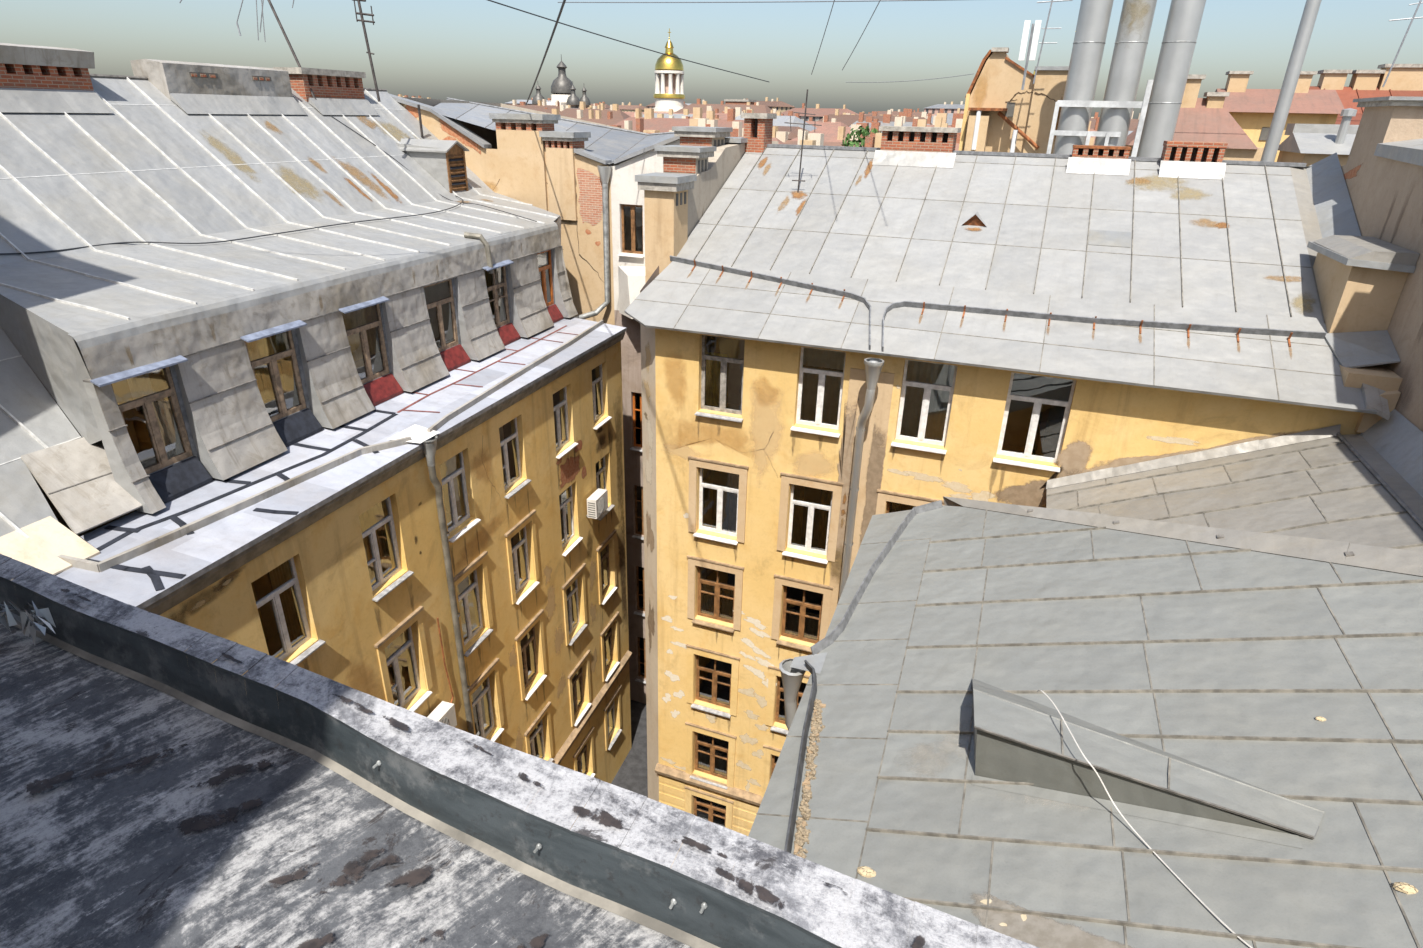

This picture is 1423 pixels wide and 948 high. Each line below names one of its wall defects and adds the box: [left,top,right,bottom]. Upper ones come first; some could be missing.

rust [356,115,407,141]
rust [210,137,253,172]
rust [283,170,343,206]
rust [341,163,402,203]
rust [1131,177,1203,199]
rust [1197,219,1229,228]
rust [1295,298,1314,311]
damp [174,571,238,624]